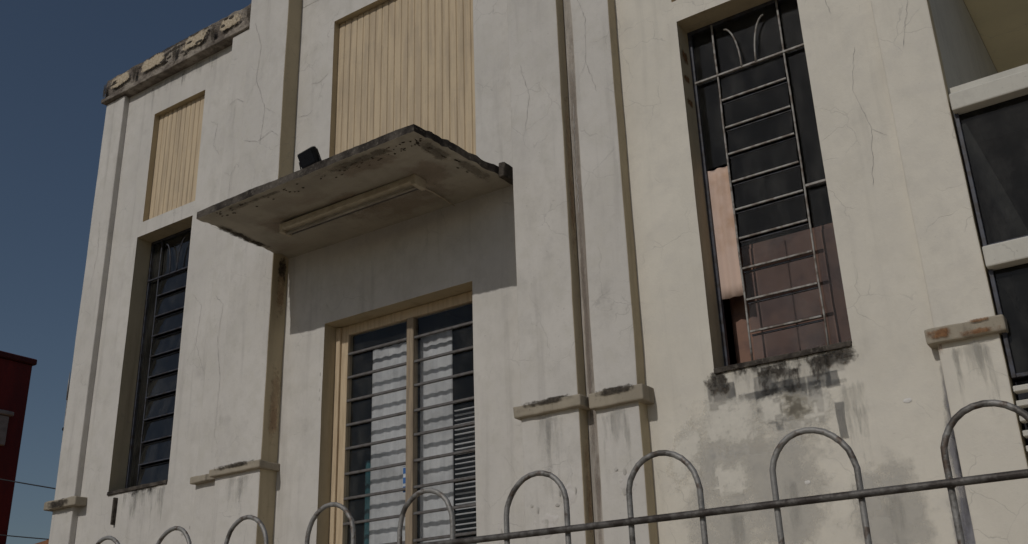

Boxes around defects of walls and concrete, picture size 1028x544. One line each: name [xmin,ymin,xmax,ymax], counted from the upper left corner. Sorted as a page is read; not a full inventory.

flaking render [110,11,243,89]
damp [704,347,855,396]
peeling [524,482,578,539]
damp [697,433,817,544]
damp [858,467,929,544]